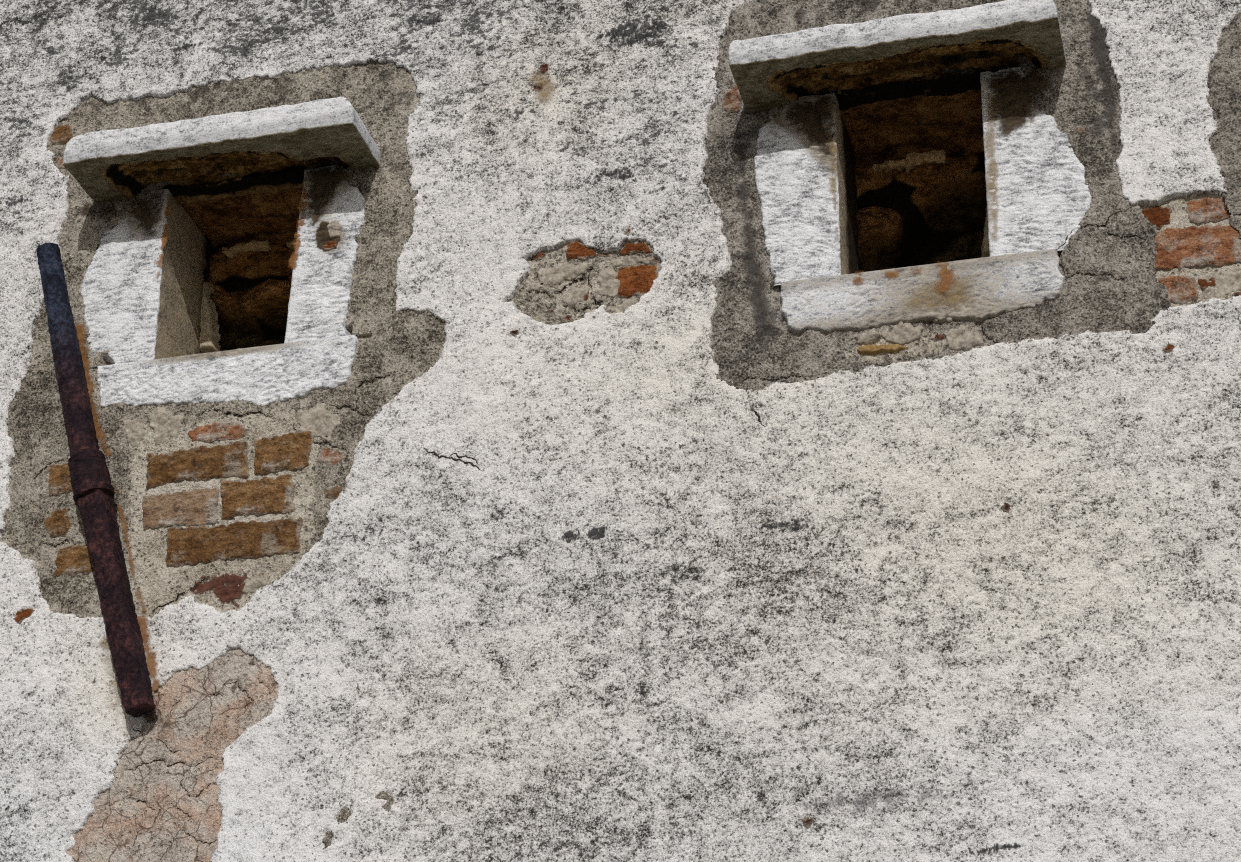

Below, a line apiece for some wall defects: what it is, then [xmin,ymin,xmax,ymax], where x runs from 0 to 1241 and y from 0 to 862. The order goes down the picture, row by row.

spalling [0,303,103,624]
corrosion [75,324,112,455]
spalling [46,61,446,618]
crack [423,445,480,470]
spalling [506,228,661,325]
spalling [703,0,1241,394]
corrosion [137,592,161,692]
spalling [66,648,278,862]